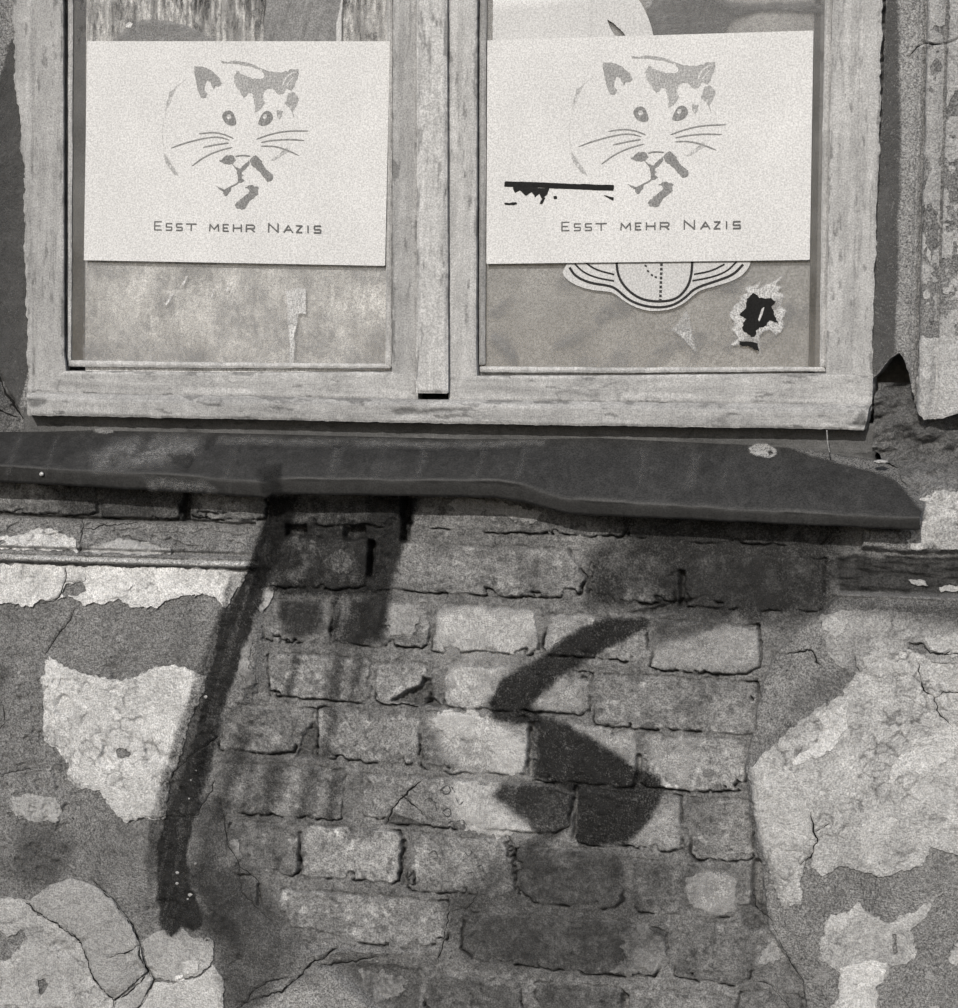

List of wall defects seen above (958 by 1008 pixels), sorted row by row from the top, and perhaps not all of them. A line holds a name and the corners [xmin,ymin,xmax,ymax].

peeling [916,0,958,420]
crack [0,377,24,419]
peeling [84,572,133,601]
peeling [44,660,63,689]
crack [786,608,958,726]
peeling [123,782,169,817]
crack [802,816,828,863]
crack [24,882,154,1008]
flaking render [0,878,225,1008]
crack [752,888,807,1008]
peeling [826,912,849,932]
peeling [837,960,888,1008]